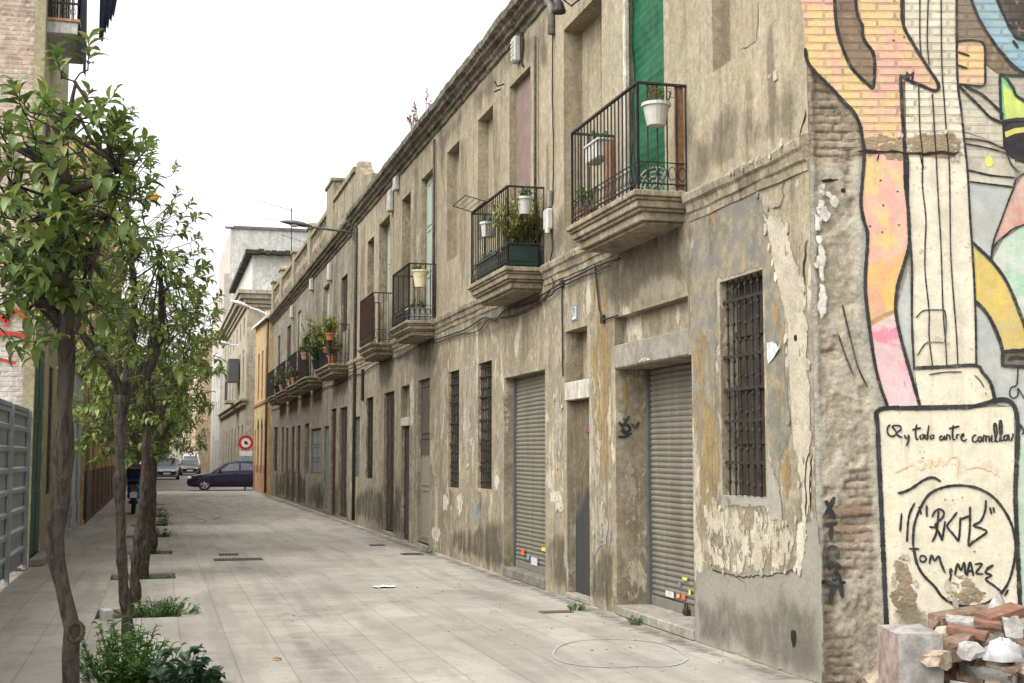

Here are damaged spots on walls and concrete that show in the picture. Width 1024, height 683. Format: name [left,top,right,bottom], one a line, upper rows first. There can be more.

peeling [690,184,839,577]
spalling [824,503,872,533]
leakage [453,525,502,564]
spalling [889,553,918,613]
spalling [944,575,984,608]